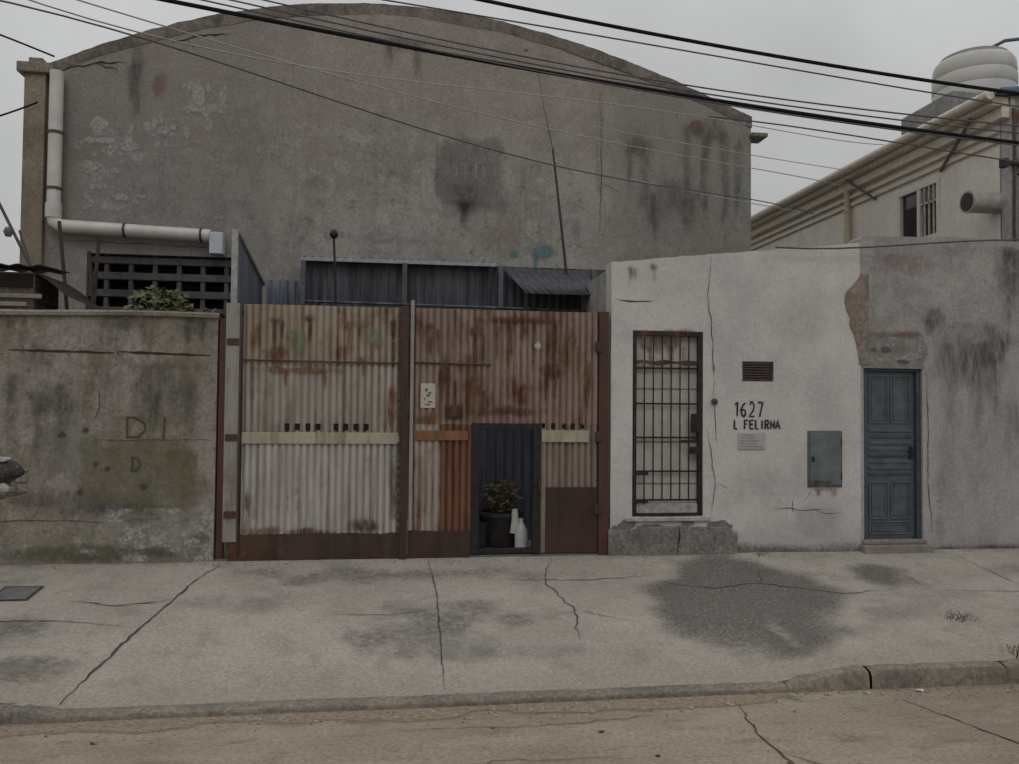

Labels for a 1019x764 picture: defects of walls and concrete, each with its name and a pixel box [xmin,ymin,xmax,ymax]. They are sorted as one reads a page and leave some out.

crack [0,348,211,356]
crack [707,258,718,367]
flaking render [845,274,928,369]
crack [707,391,725,513]